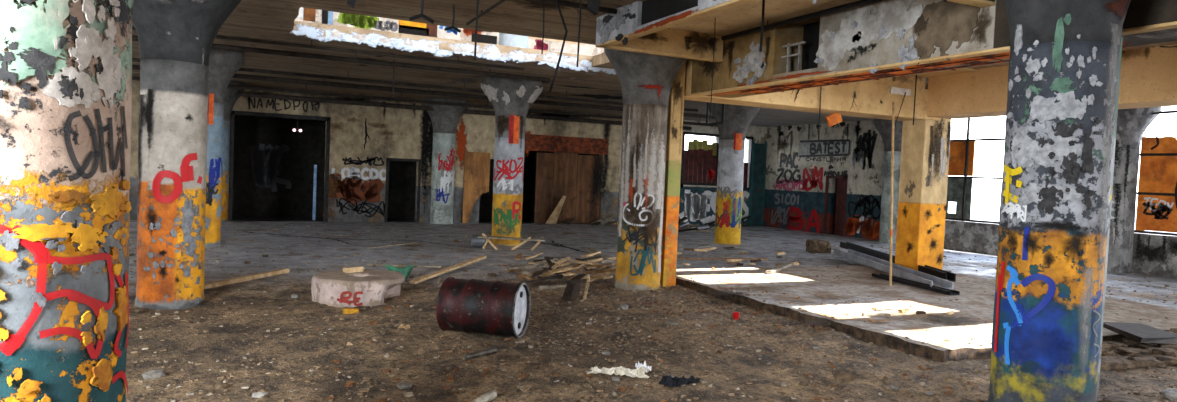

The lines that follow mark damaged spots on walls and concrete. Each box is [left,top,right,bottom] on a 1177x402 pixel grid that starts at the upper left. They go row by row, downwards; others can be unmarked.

peeling [0,0,124,109]
peeling [712,0,1103,214]
peeling [0,179,132,346]
peeling [143,197,201,304]
peeling [6,367,51,402]
peeling [90,358,113,392]